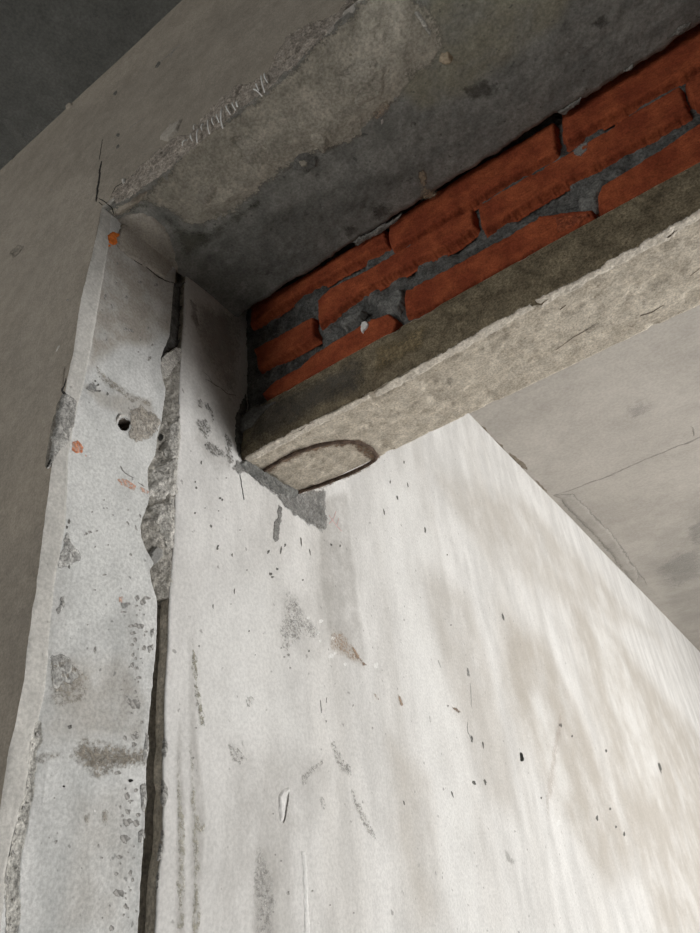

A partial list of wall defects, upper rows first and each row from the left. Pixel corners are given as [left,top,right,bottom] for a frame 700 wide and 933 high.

crack [95,139,133,214]
spalling [111,0,354,215]
spalling [245,209,700,462]
spalling [45,367,77,469]
spalling [121,282,187,714]
crack [481,426,700,495]
spalling [123,721,149,765]
spalling [4,721,43,933]
spalling [109,771,147,918]